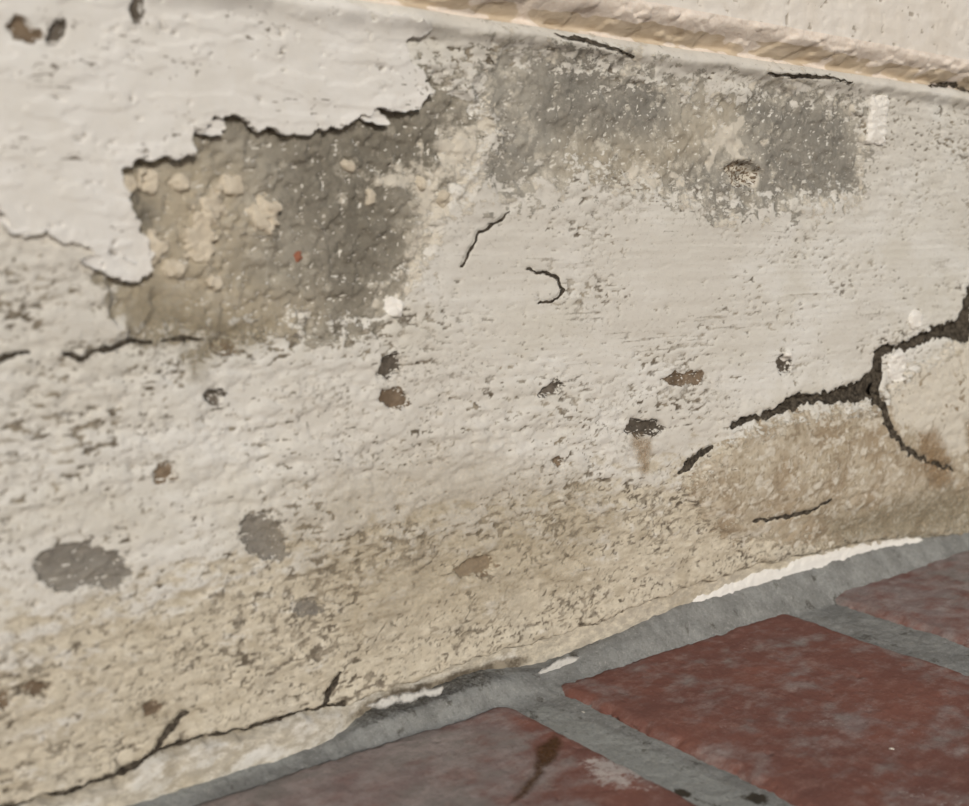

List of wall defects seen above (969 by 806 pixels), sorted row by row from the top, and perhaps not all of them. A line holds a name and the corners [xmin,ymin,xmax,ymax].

peeling [0,0,875,372]
crack [460,211,510,267]
crack [526,267,565,304]
crack [731,287,969,472]
crack [678,445,714,474]
peeling [33,540,133,593]
crack [0,671,346,806]